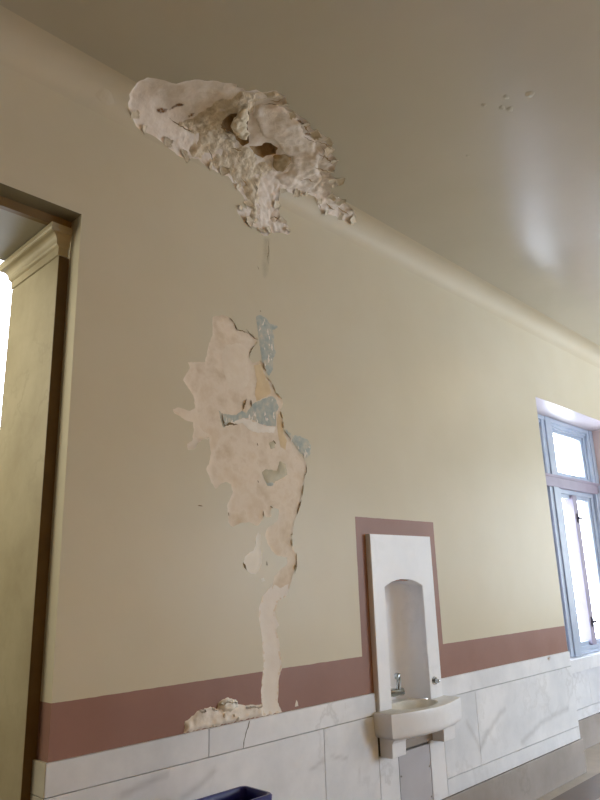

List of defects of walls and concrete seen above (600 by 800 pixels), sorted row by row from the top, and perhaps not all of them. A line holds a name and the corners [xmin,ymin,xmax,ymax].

peeling [173,315,311,733]